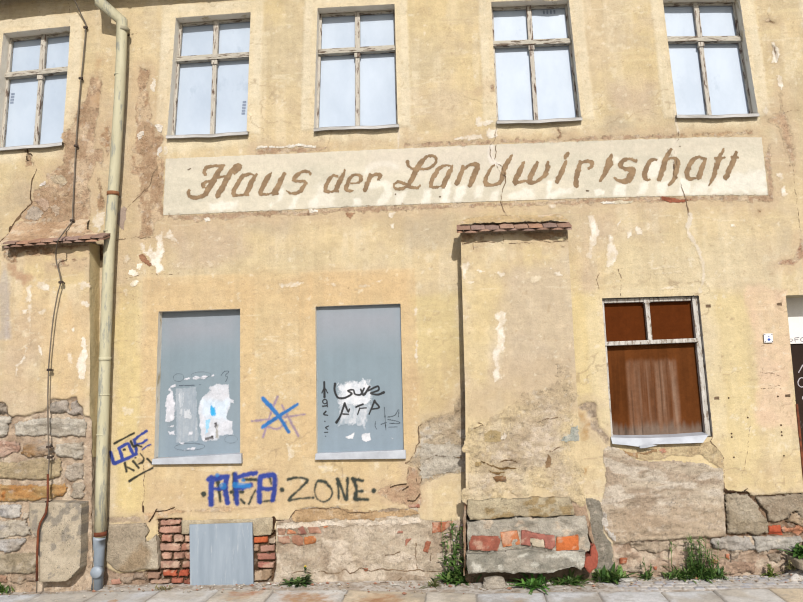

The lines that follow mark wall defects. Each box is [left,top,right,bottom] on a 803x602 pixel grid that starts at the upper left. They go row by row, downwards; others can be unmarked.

crack [0,169,37,242]
peeling [21,77,111,233]
peeling [122,67,789,296]
crack [463,132,562,250]
peeling [762,75,797,167]
peeling [492,311,508,383]
flaking render [0,397,94,592]
peeling [189,465,244,473]
spalling [377,363,610,507]
spalling [623,442,723,469]
flaking render [103,505,259,585]